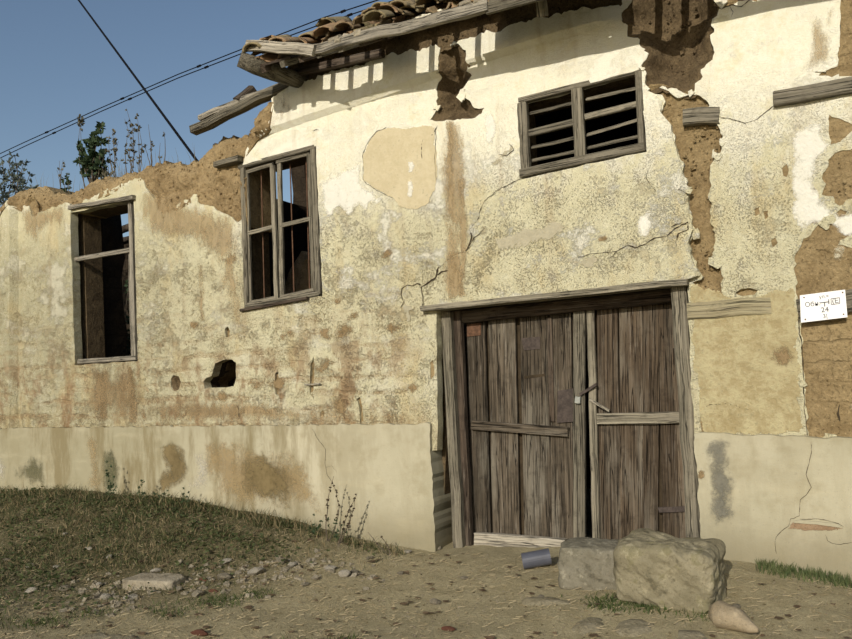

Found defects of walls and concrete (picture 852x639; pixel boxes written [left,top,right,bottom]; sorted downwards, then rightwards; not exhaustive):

damp [447,122,467,297]
crack [401,178,522,306]
peeling [287,0,852,438]
spalling [210,360,236,401]
damp [160,444,186,490]
damp [199,446,309,504]
damp [709,443,731,519]
crack [775,314,812,554]
spalling [790,520,840,531]